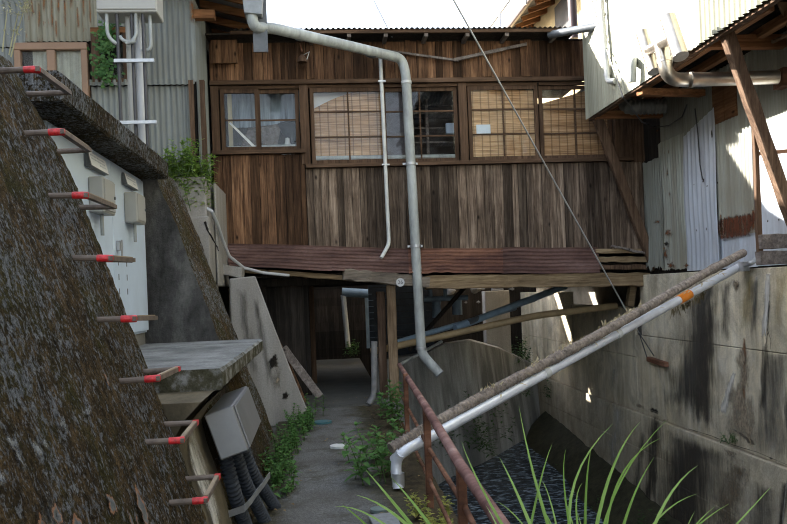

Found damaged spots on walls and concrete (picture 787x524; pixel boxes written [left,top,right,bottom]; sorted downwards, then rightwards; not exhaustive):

rust [718,210,755,239]
leakage [744,275,770,335]
leakage [673,287,713,422]
leakage [761,348,787,440]
peeling [38,503,82,524]
peeling [106,493,117,515]
peeling [127,485,149,524]
leakage [636,418,659,500]
leakage [665,439,713,524]
leakage [779,485,787,524]